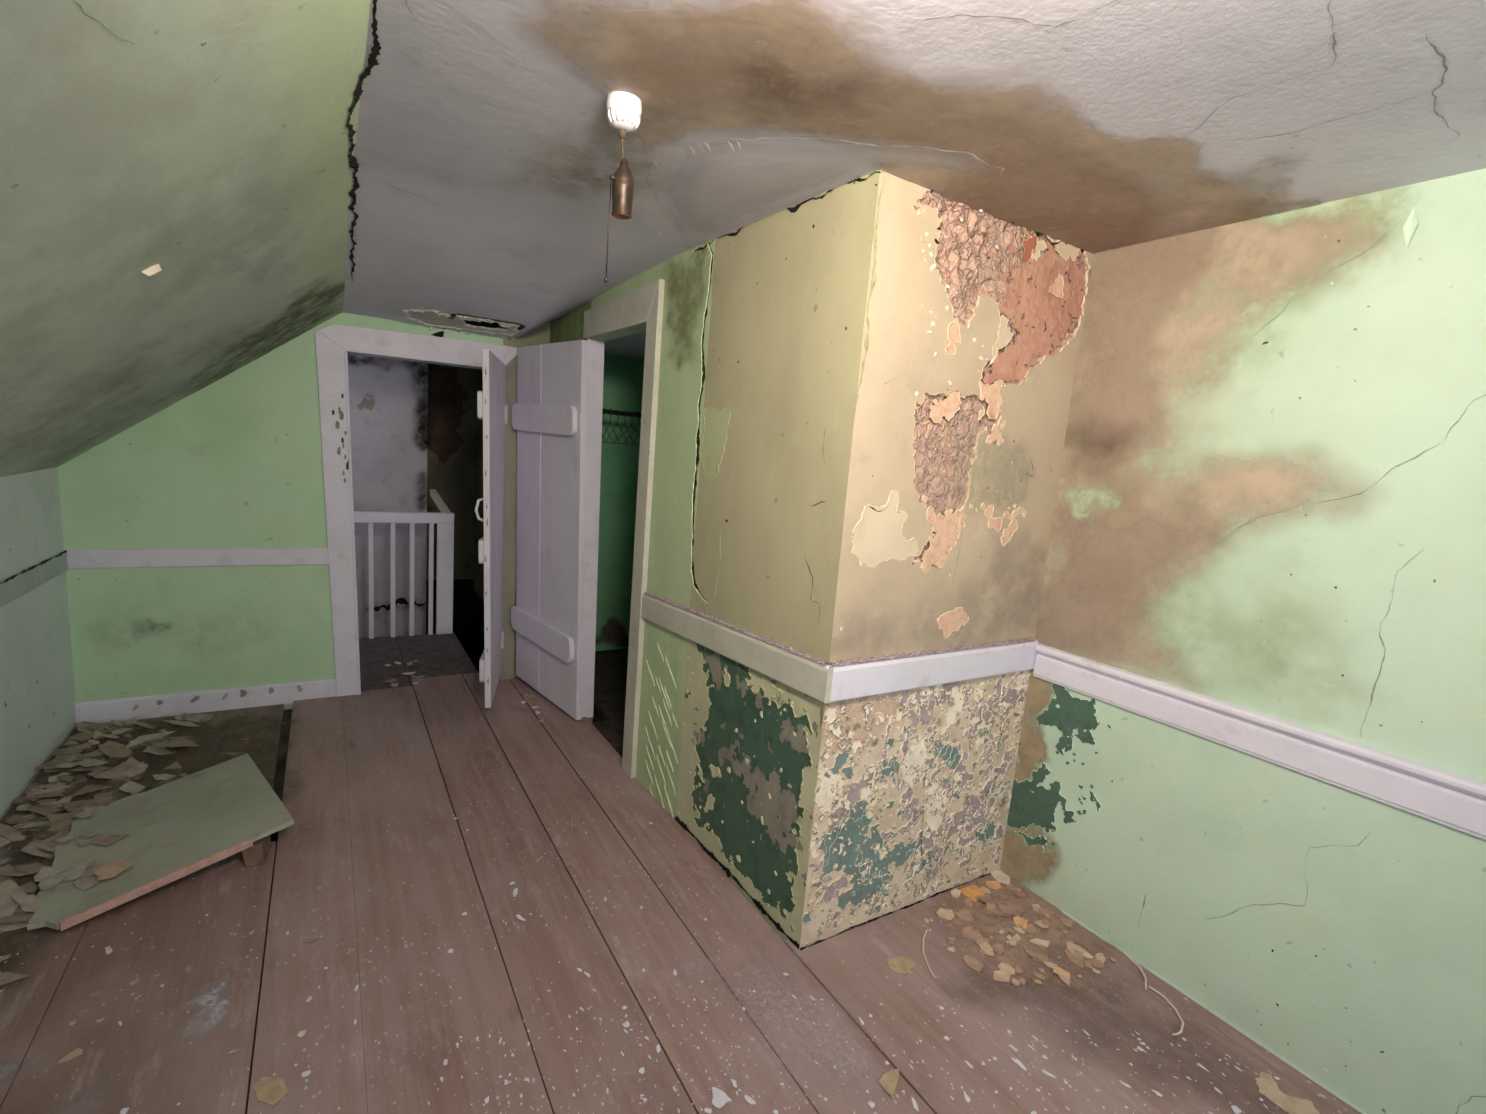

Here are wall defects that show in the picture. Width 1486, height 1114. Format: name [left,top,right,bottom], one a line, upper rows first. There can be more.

crack [346,0,441,275]
crack [1192,0,1460,142]
damp [348,355,441,450]
damp [537,0,1378,674]
spalling [851,189,1092,576]
crack [1317,395,1486,503]
crack [1360,550,1423,737]
peeling [677,642,1112,948]
crack [1197,833,1370,919]